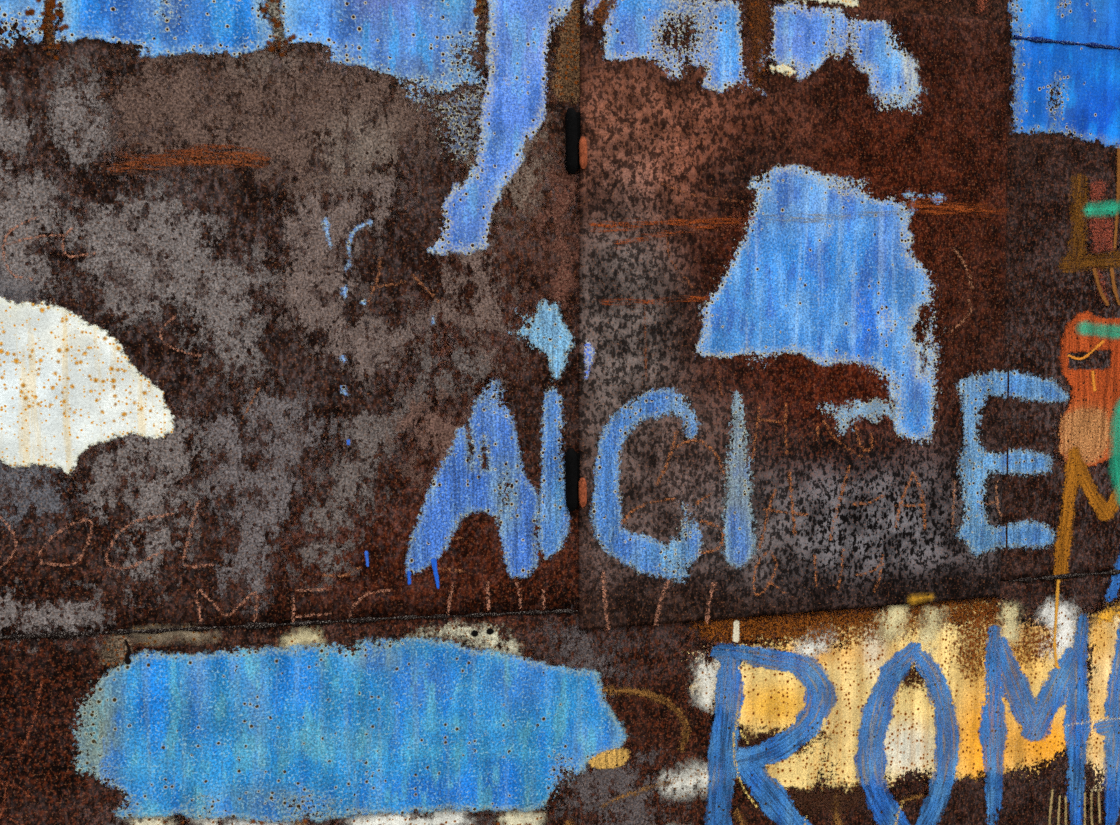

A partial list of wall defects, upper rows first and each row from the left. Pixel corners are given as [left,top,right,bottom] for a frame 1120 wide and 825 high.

rust [21,0,68,60]
rust [261,0,296,57]
rust [551,0,620,104]
peeling [584,0,601,25]
rust [741,0,772,87]
peeling [769,63,796,76]
rust [108,144,271,172]
rust [591,217,755,244]
rust [906,197,1000,215]
rust [0,331,90,415]
rust [88,366,152,422]
rust [97,633,133,667]